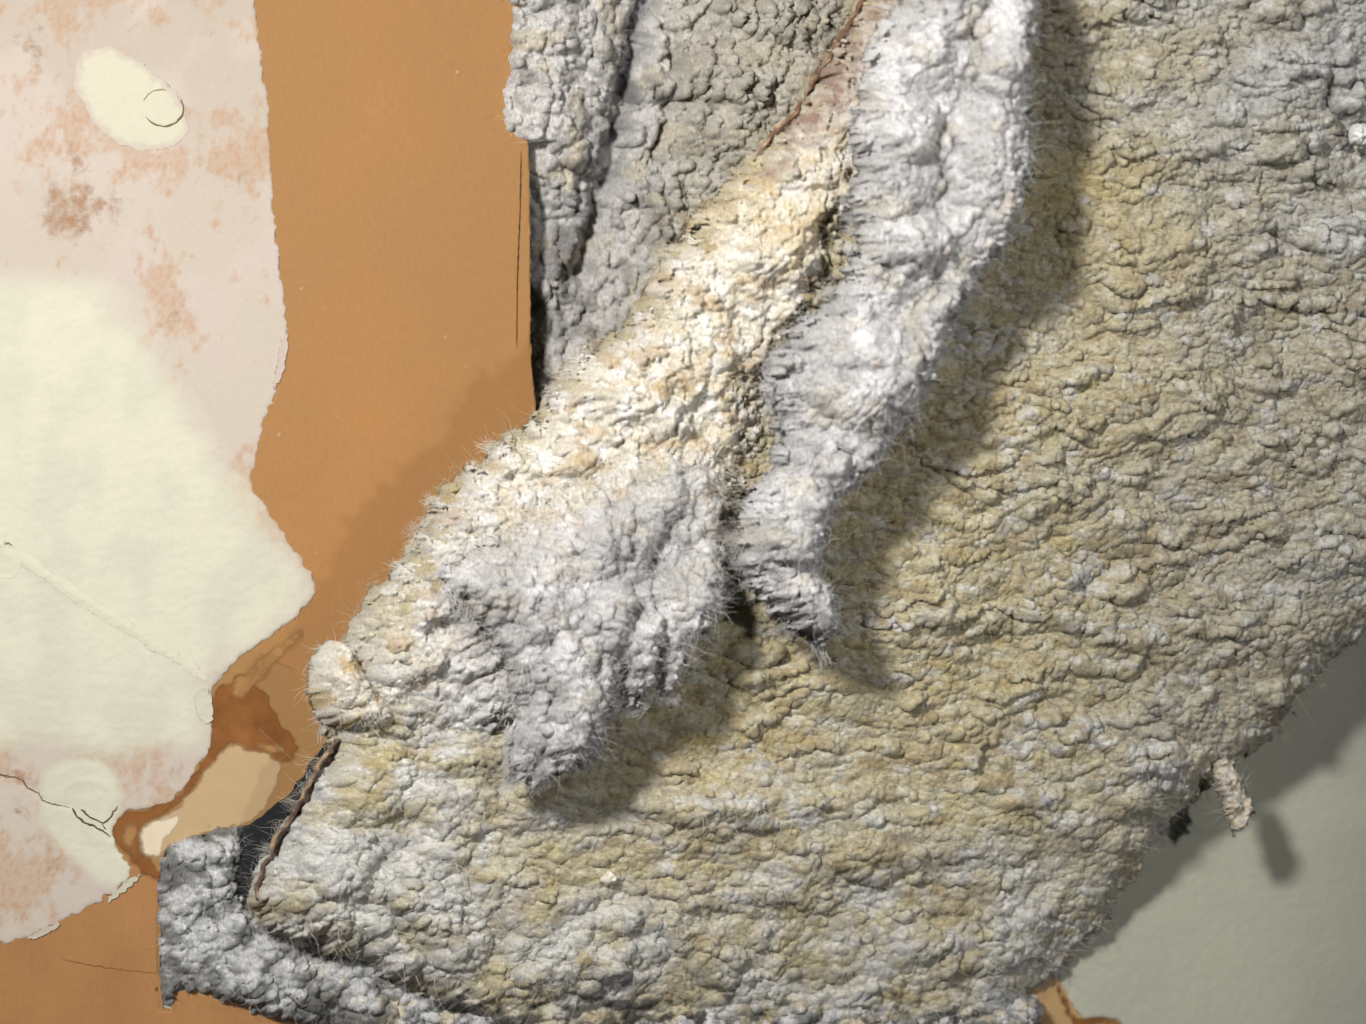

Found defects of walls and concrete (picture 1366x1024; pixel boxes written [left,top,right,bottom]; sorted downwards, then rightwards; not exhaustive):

peeling [251,0,535,737]
peeling [194,687,213,724]
damp [113,630,302,878]
peeling [0,745,307,1024]
peeling [1029,978,1084,1024]